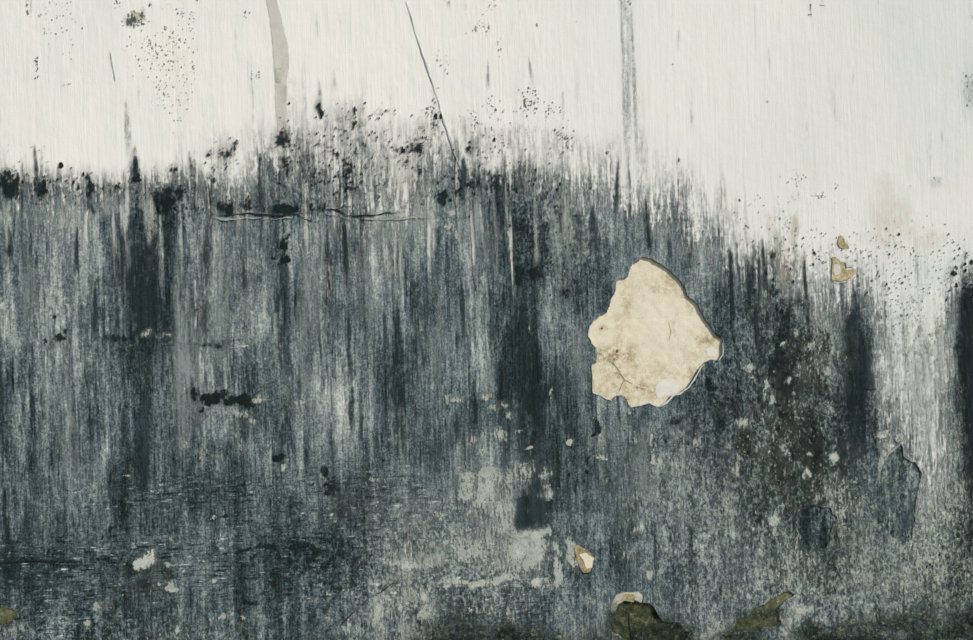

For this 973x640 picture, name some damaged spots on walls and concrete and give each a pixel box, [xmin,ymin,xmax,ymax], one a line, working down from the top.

leakage [622,18,636,116]
spalling [588,257,724,414]
peeling [831,235,856,283]
peeling [309,393,595,640]
spalling [579,292,973,640]